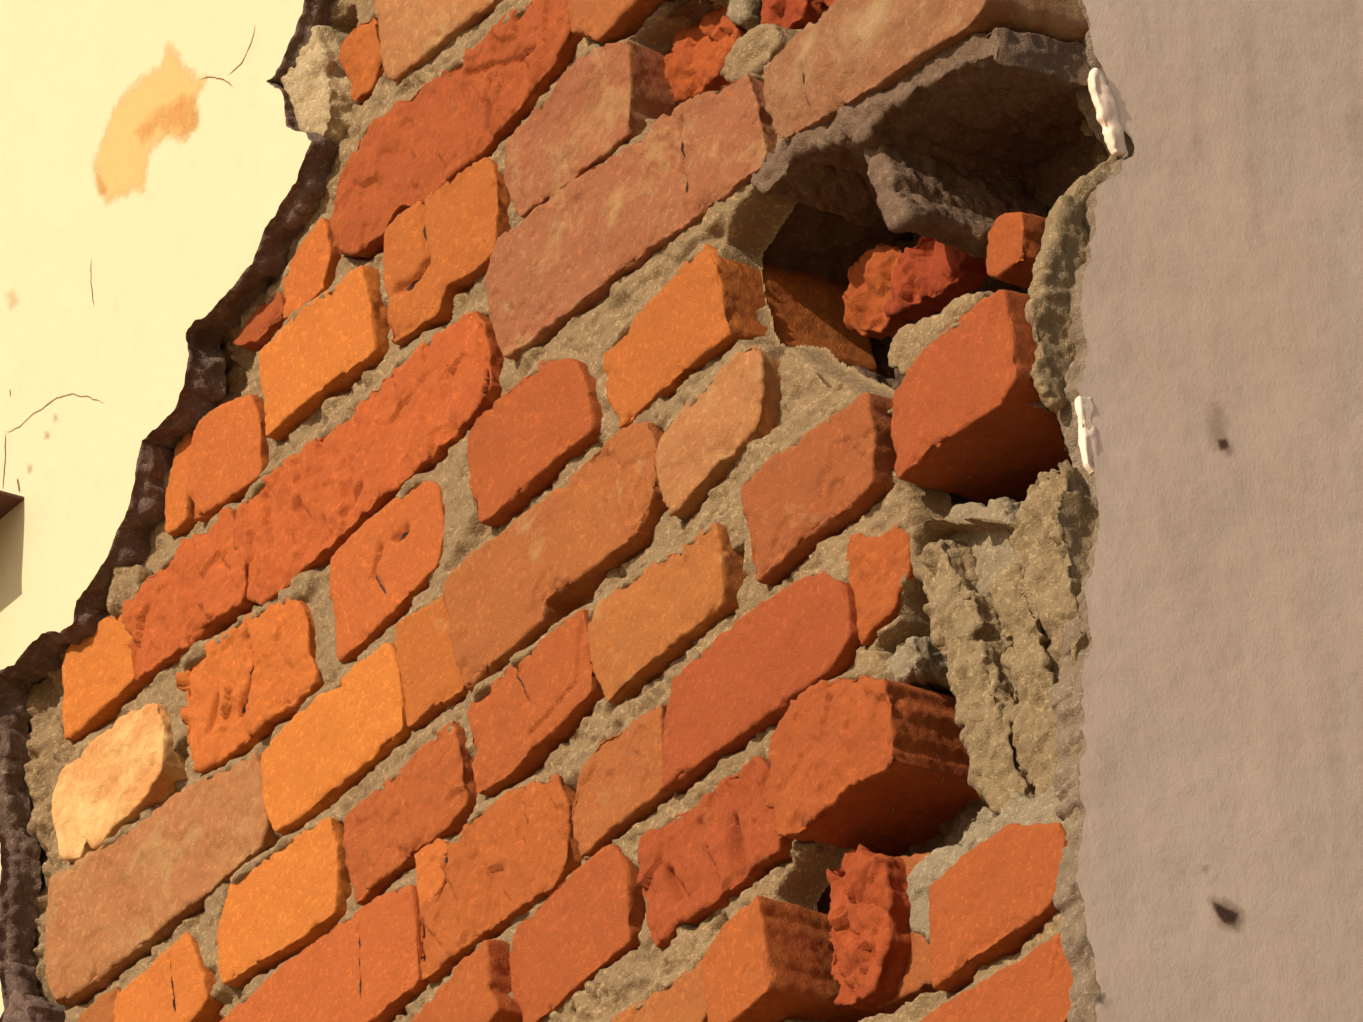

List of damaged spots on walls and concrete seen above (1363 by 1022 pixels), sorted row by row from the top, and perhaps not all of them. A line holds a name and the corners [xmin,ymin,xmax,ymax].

crack [200,28,255,85]
flaking render [326,0,674,346]
flaking render [485,0,1126,361]
crack [3,393,102,492]
flaking render [23,0,532,1003]
flaking render [2,155,1120,1022]